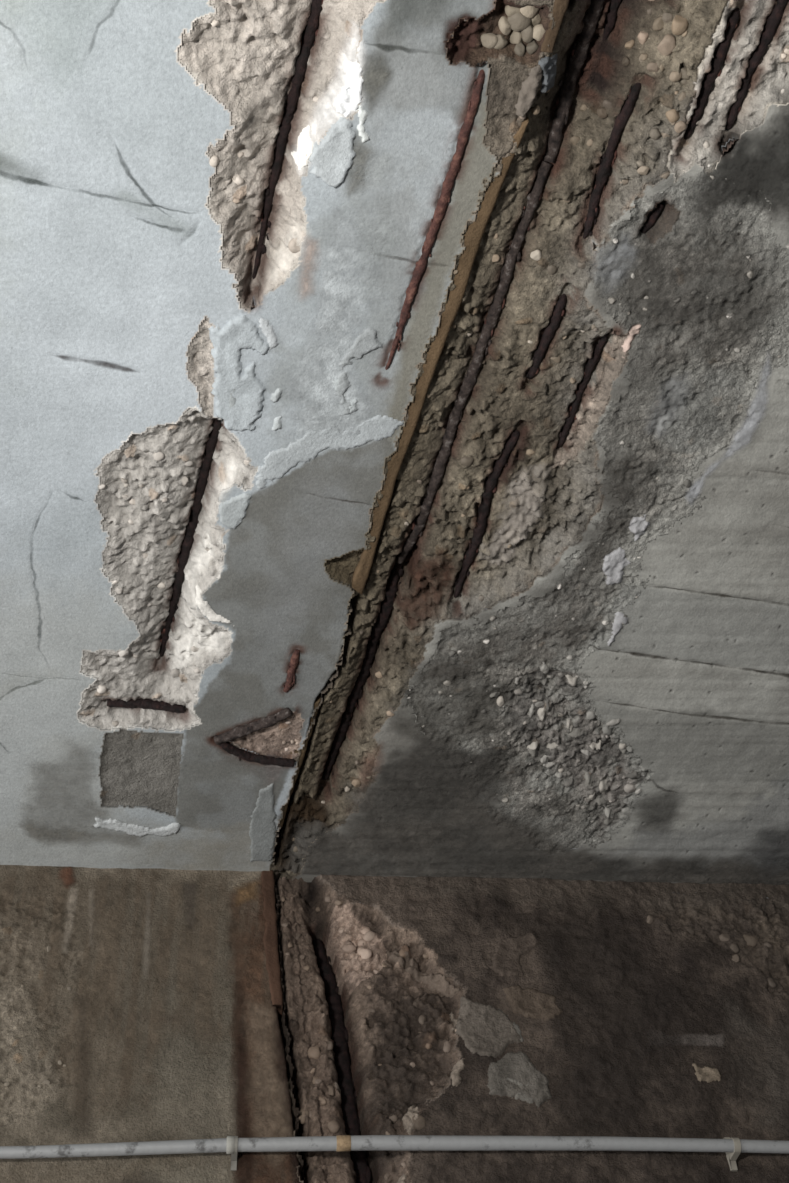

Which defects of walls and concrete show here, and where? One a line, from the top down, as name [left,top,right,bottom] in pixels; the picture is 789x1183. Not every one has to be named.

corrosion [445,15,481,62]
crack [18,177,46,185]
crack [122,163,169,228]
water stain [700,120,789,213]
spalling [77,0,789,853]
crack [666,587,748,599]
crack [596,647,665,658]
crack [659,710,748,721]
water stain [287,669,789,885]
corrosion [274,793,328,871]
spalling [249,783,563,1137]
spalling [300,1150,413,1183]